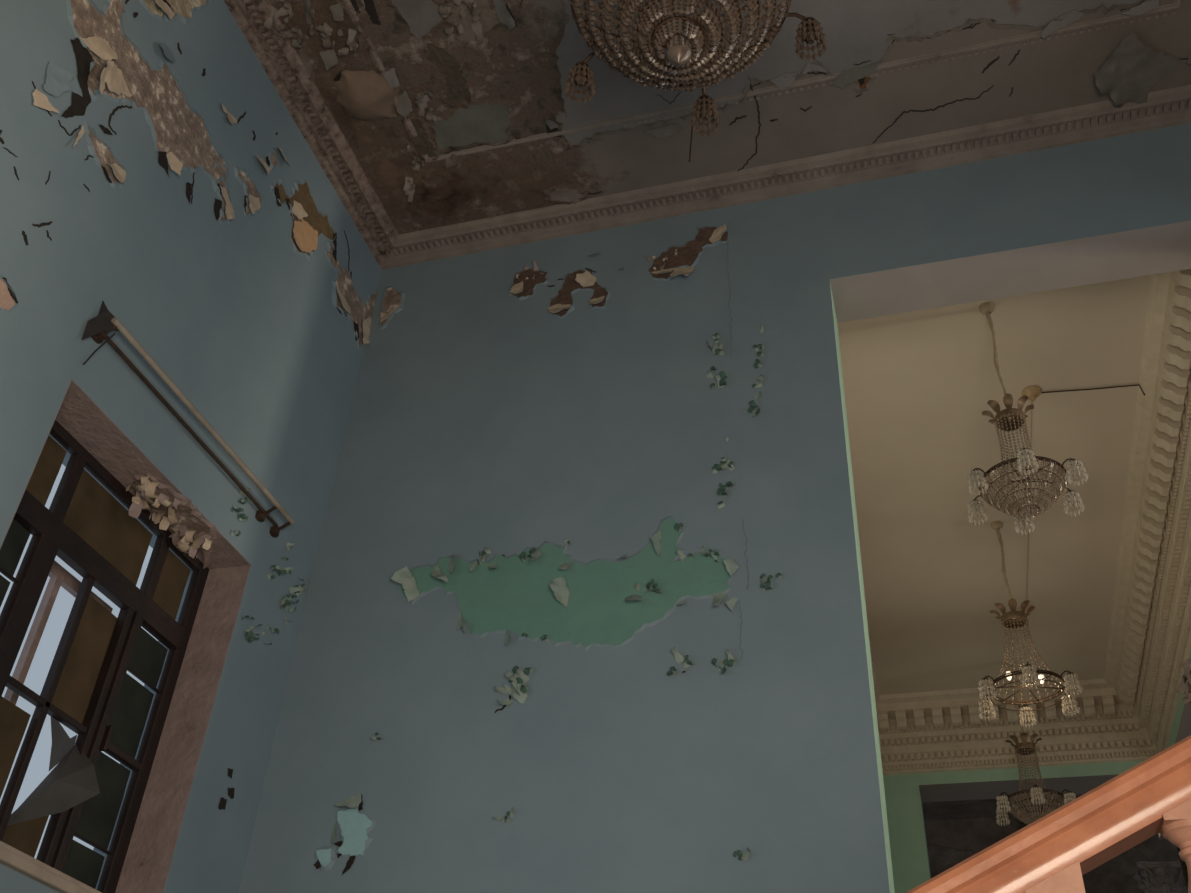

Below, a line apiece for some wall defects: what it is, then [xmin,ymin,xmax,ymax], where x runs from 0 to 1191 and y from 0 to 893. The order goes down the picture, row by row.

crack [0,130,51,184]
peeling [32,0,406,350]
flaking render [258,0,518,202]
crack [730,77,812,171]
crack [873,50,1020,143]
peeling [0,275,18,313]
crack [22,221,53,245]
peeling [508,252,611,319]
peeling [645,223,730,281]
peeling [390,515,739,652]
peeling [494,666,534,713]
peeling [313,793,376,876]